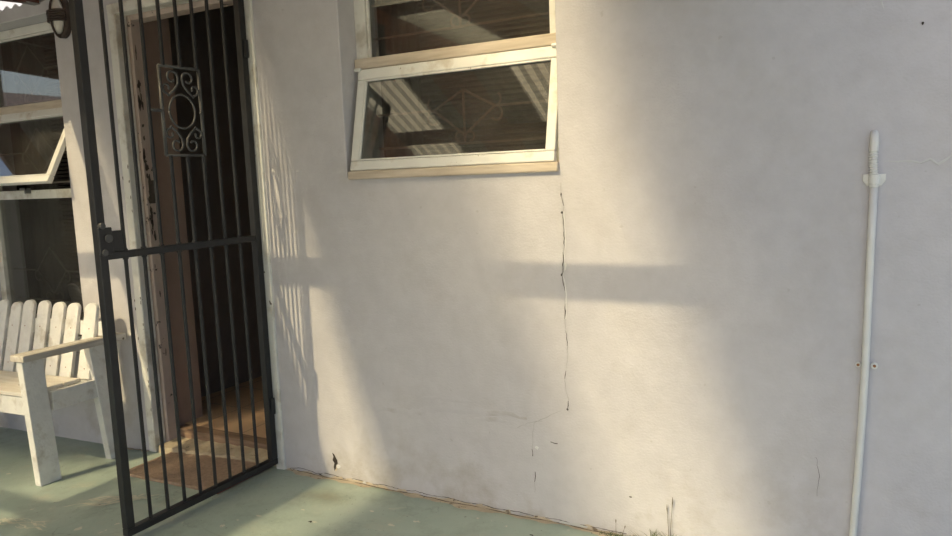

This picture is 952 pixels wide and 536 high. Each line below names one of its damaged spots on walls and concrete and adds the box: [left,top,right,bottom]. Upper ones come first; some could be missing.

crack [517,186,569,484]
peeling [286,453,634,536]